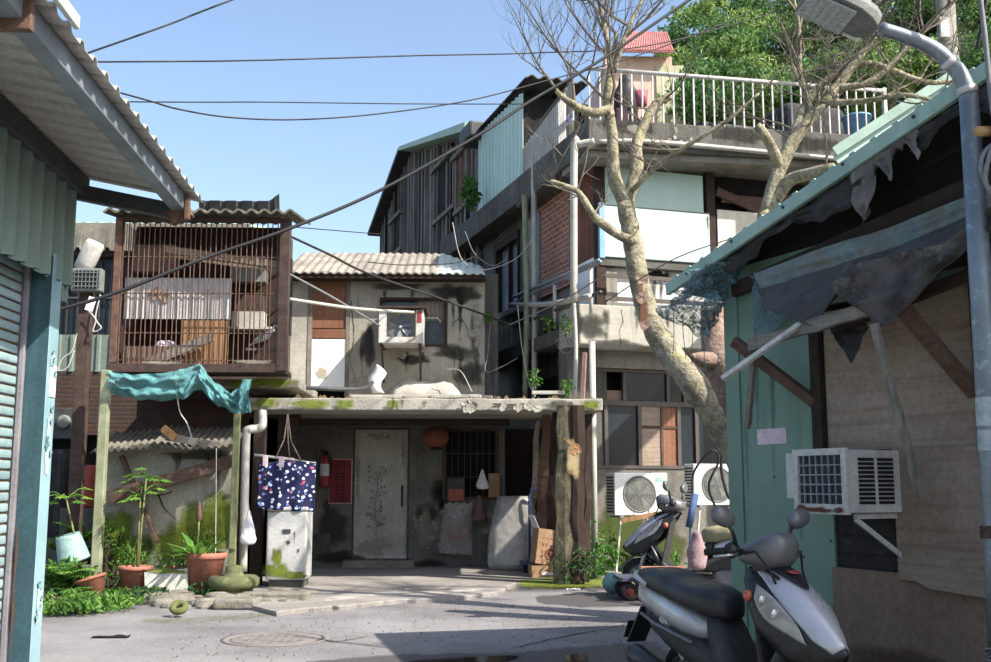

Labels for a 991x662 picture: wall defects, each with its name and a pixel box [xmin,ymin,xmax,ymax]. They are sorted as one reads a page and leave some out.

damp [377,284,421,301]
damp [360,326,374,363]
damp [399,285,485,385]
damp [577,312,642,349]